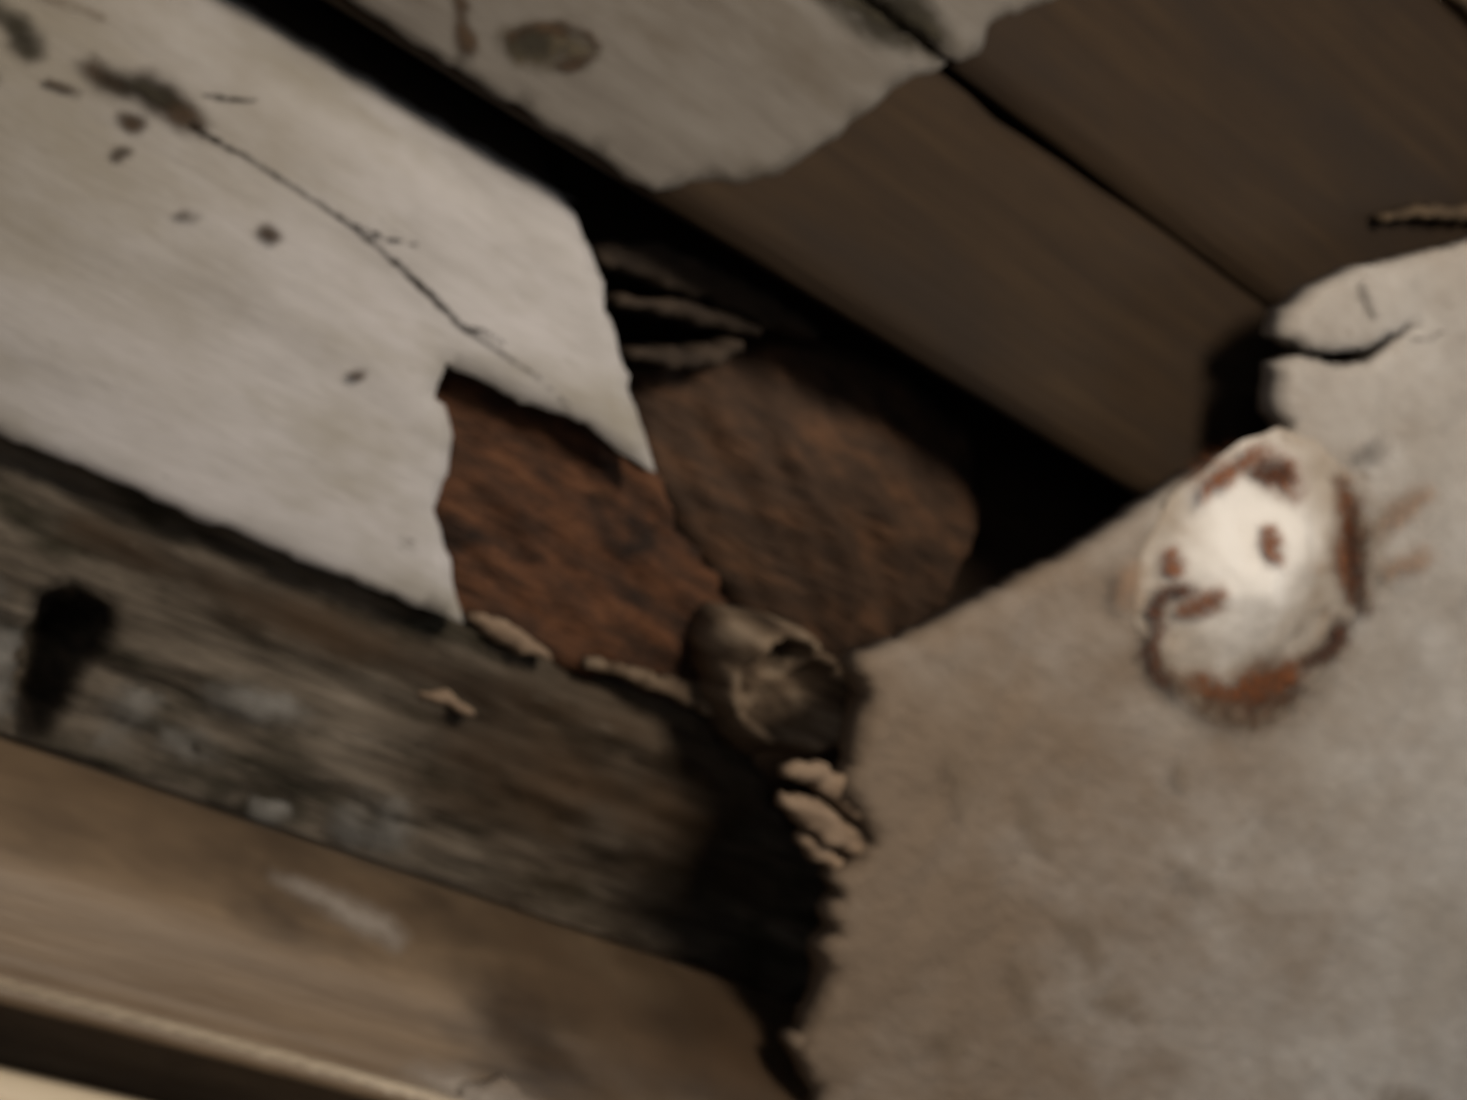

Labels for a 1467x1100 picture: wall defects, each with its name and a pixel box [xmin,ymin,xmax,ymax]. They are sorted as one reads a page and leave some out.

crack [191,95,532,373]
crack [1289,285,1420,364]
spalling [433,369,728,696]
rust [1202,445,1300,502]
rust [1142,480,1431,727]
spalling [774,759,867,869]